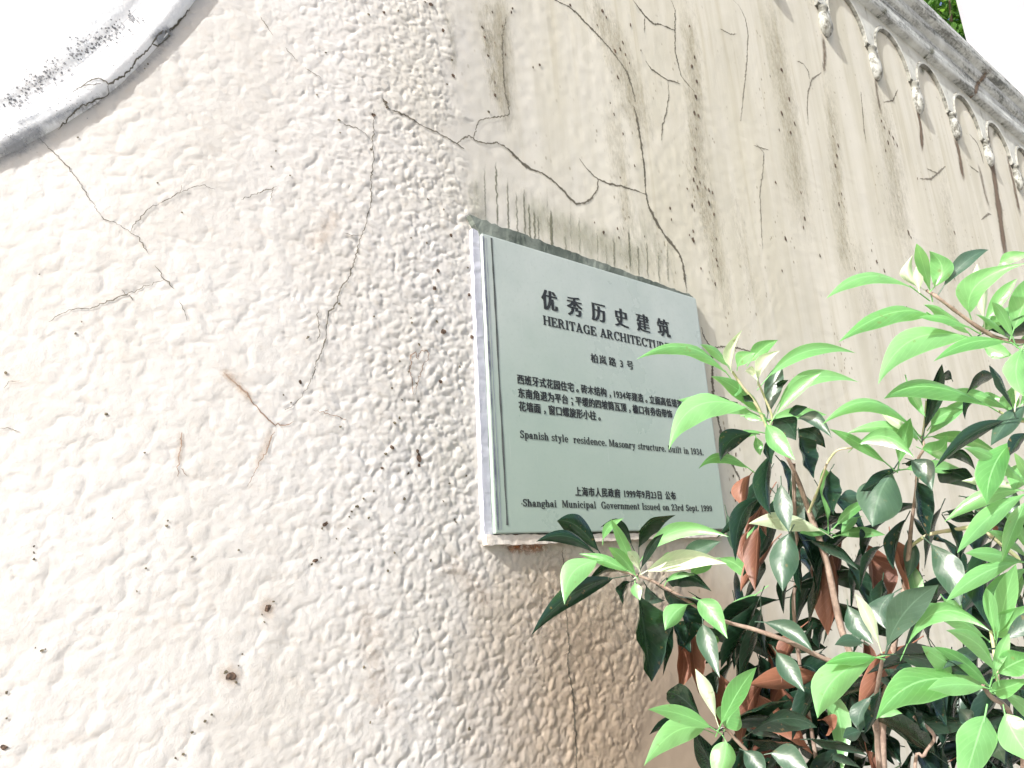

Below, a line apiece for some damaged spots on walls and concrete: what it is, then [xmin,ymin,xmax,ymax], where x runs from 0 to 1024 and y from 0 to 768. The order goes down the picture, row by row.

water stain [0,10,144,155]
crack [721,6,749,121]
crack [798,61,820,125]
crack [39,10,214,322]
crack [224,0,690,482]
crack [754,145,768,249]
water stain [980,165,1007,253]